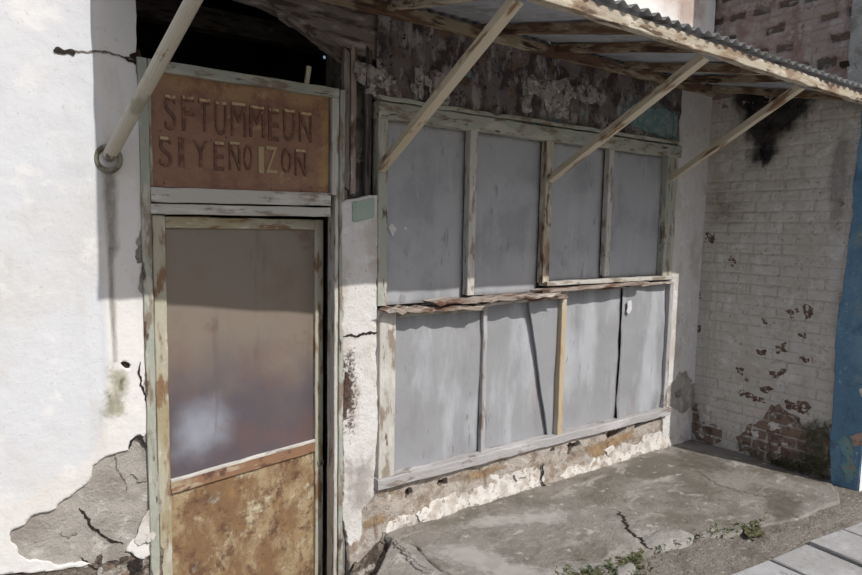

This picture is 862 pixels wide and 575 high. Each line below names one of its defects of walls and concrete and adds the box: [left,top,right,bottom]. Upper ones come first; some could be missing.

crack [53,47,136,63]
peeling [353,60,446,101]
peeling [522,74,607,120]
damp [105,174,115,334]
crack [343,330,378,338]
damp [107,372,125,414]
crack [138,361,146,401]
peeling [560,371,722,479]
flaking render [736,367,862,484]
flaking render [6,435,164,575]
peeling [386,466,545,533]
crack [617,511,653,549]